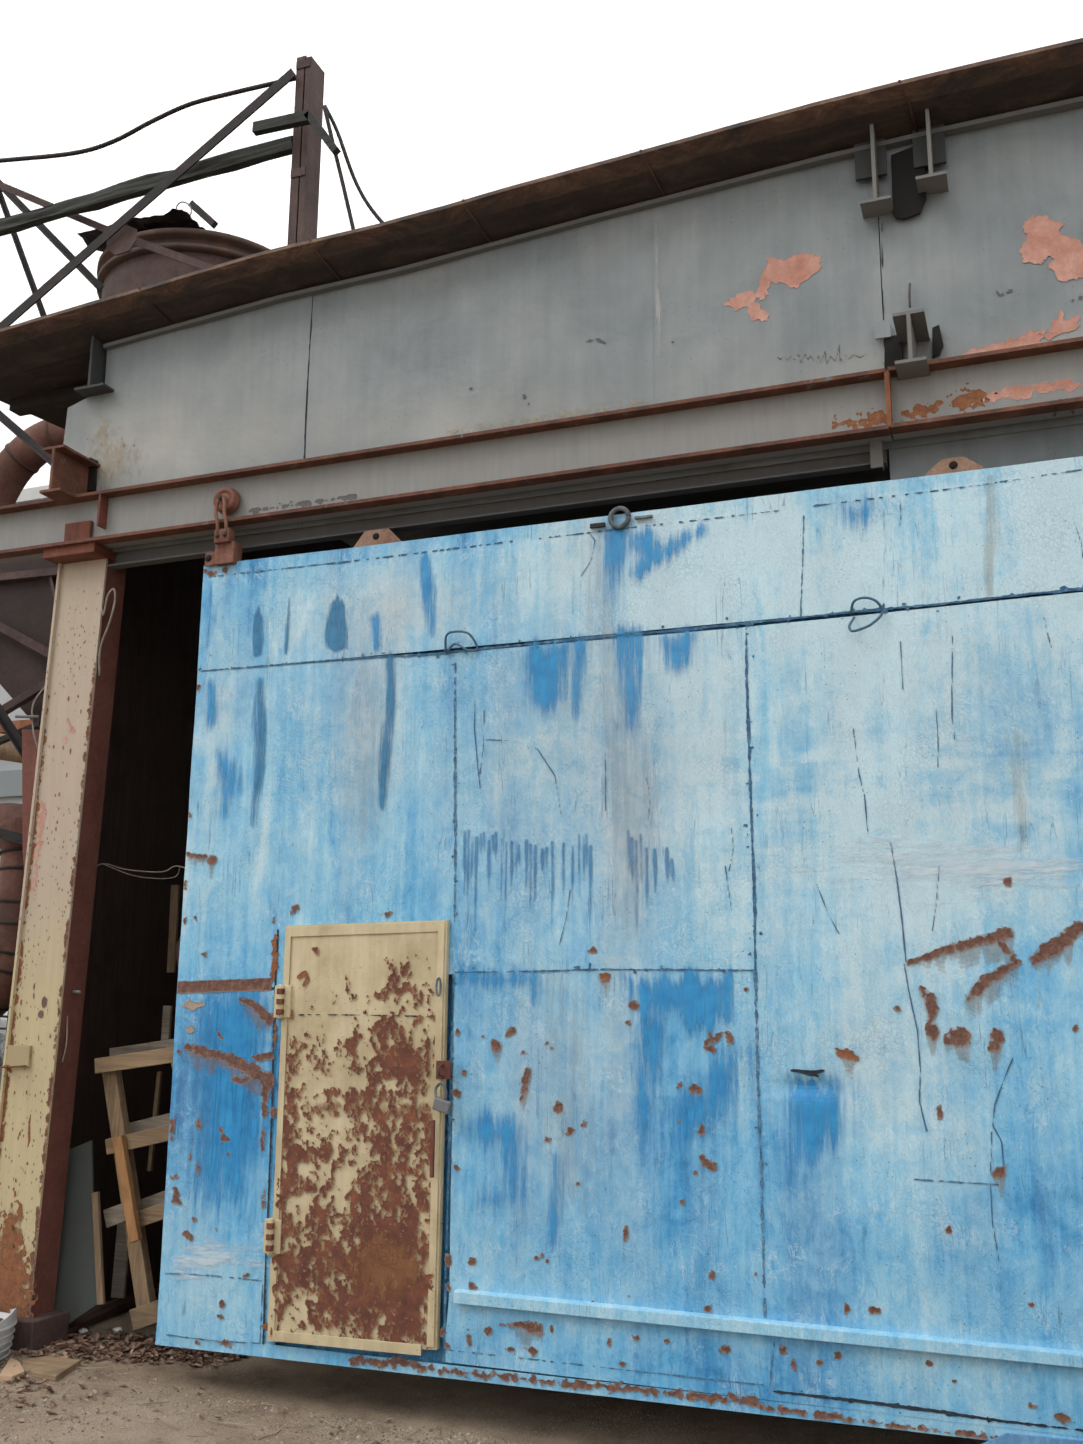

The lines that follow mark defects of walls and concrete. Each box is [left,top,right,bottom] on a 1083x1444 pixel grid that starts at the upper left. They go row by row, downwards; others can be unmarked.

peeling [723,253,822,322]
peeling [959,215,1083,356]
peeling [981,378,1083,404]
corrosion [10,695,50,1045]
corrosion [904,921,1083,1002]
corrosion [183,1043,275,1090]
corrosion [491,1027,516,1052]
corrosion [835,1048,859,1061]
corrosion [919,985,971,1047]
corrosion [987,1027,1005,1053]
corrosion [0,985,63,1318]
corrosion [348,1354,999,1440]